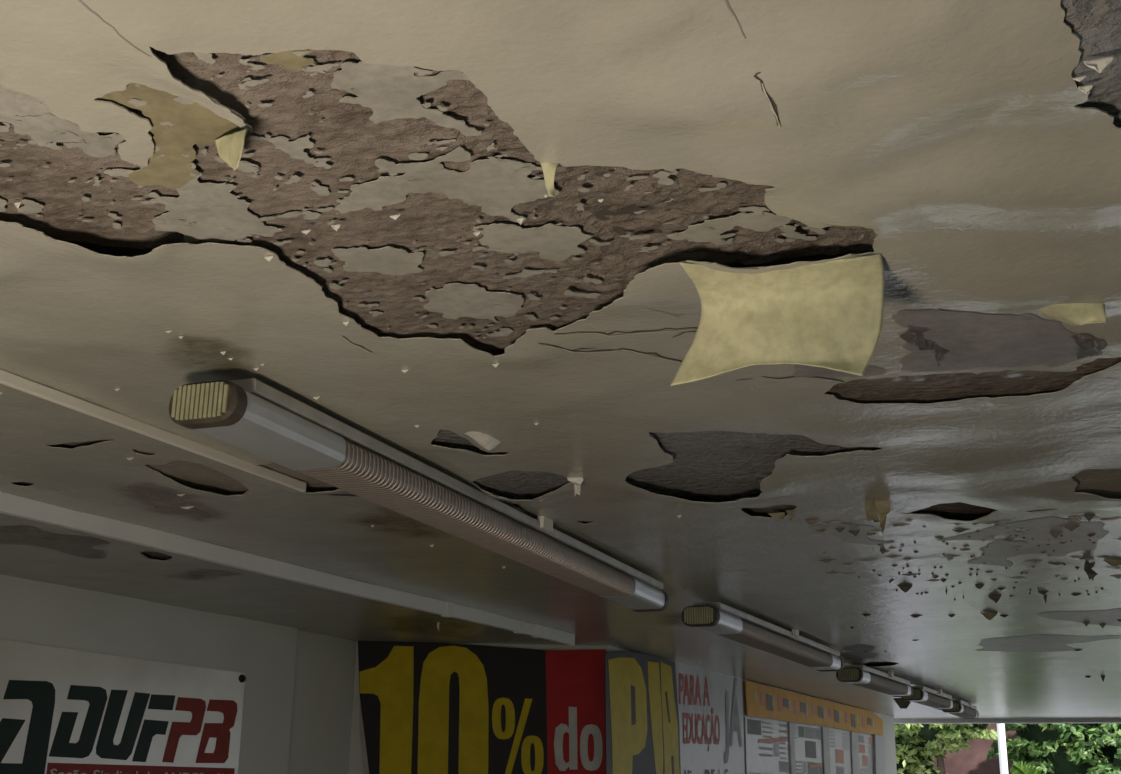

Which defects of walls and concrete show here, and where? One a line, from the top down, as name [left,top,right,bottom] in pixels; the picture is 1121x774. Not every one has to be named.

crack [725,0,746,39]
crack [754,72,780,128]
peeling [1058,0,1121,143]
peeling [0,0,968,370]
peeling [793,310,1121,414]
peeling [127,450,350,509]
peeling [418,429,1121,652]